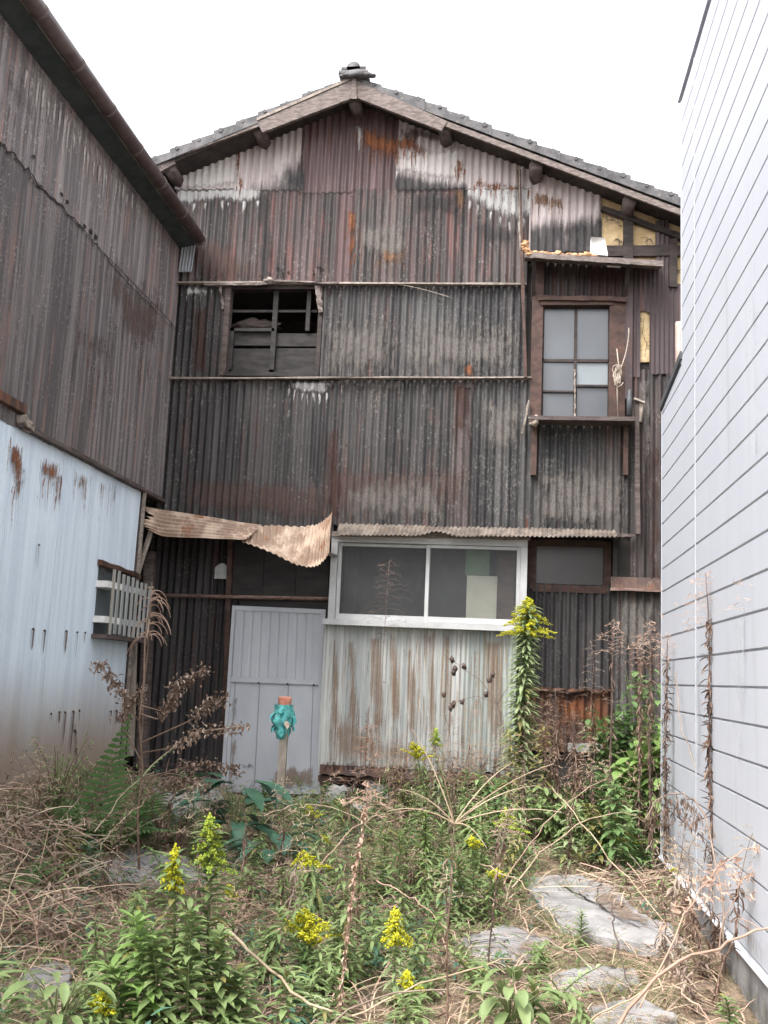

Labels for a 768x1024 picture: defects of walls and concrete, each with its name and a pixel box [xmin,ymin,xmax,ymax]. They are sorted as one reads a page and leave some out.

rust [356,127,439,169]
rust [7,439,25,521]
rust [37,459,62,509]
rust [319,635,518,784]
rust [529,688,610,737]